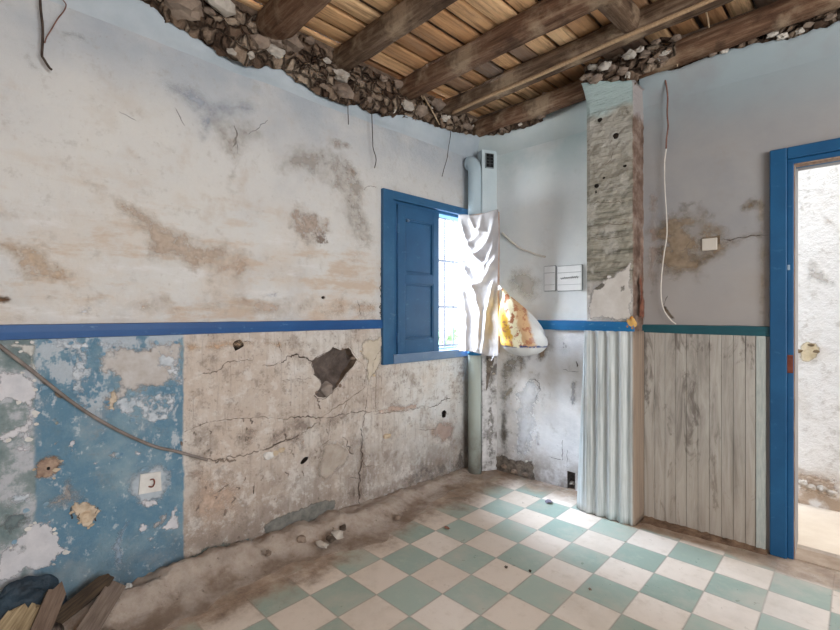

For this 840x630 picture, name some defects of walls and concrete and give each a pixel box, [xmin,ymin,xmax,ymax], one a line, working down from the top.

flaking render [141,0,480,135]
flaking render [579,8,840,86]
water stain [130,209,223,265]
water stain [292,210,327,243]
water stain [650,217,725,273]
flaking render [587,263,637,329]
peeling [0,340,68,451]
peeling [47,340,183,424]
spalling [262,337,382,409]
crack [185,380,450,504]
flaking render [487,407,535,480]
peeling [0,494,71,580]